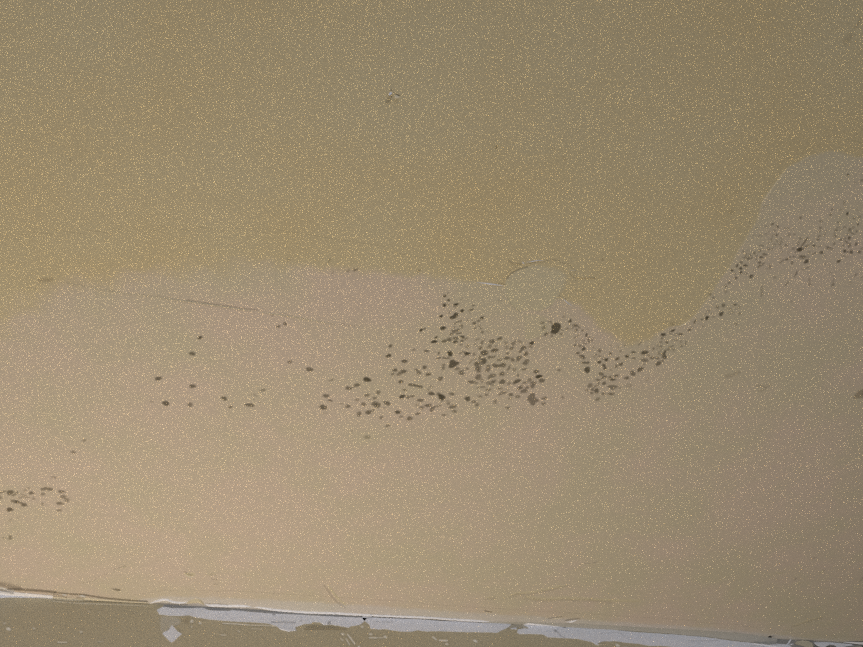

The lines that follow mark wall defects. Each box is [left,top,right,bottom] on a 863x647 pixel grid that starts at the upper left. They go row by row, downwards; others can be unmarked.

peeling [157,607,863,647]